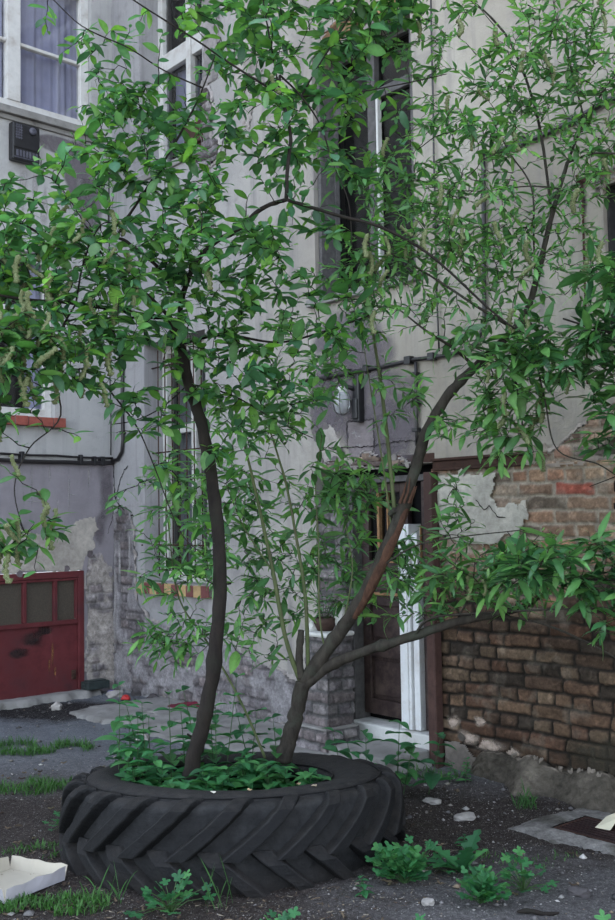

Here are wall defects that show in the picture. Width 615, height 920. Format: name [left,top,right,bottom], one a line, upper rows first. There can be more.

peeling [437,468,529,546]
spalling [0,506,209,704]
spalling [214,641,297,724]